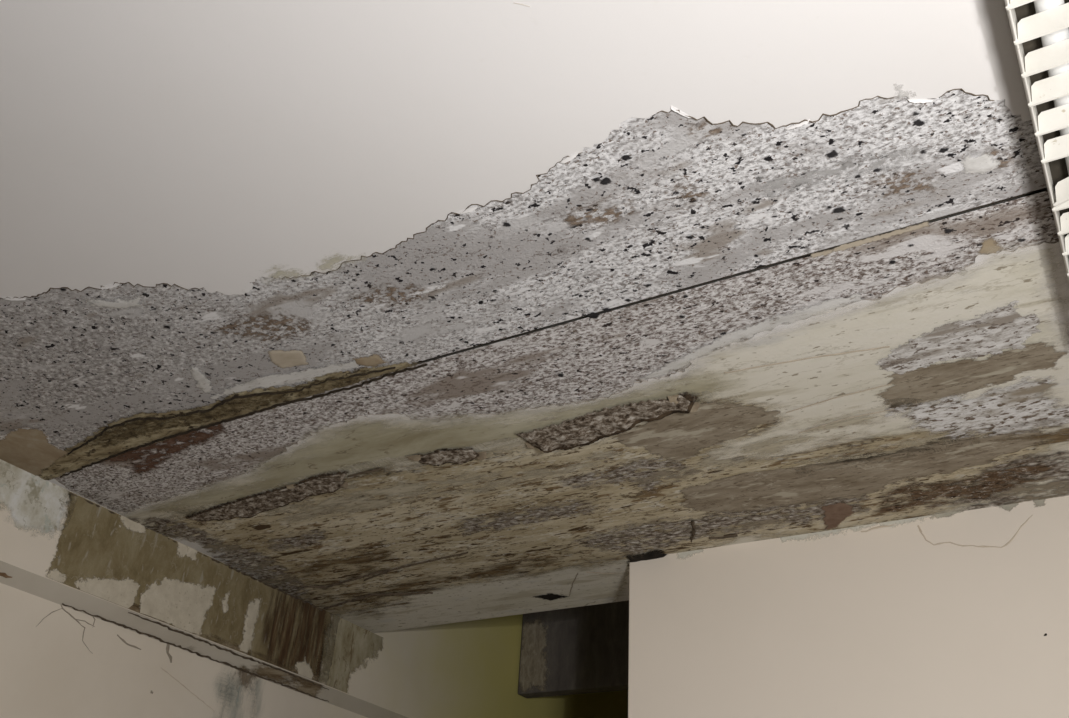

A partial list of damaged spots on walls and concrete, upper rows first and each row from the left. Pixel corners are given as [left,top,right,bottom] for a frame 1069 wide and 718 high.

crack [348,468,381,477]
peeling [0,84,1069,604]
damp [47,250,1069,704]
crack [416,187,1047,363]
crack [724,346,890,374]
crack [786,384,894,433]